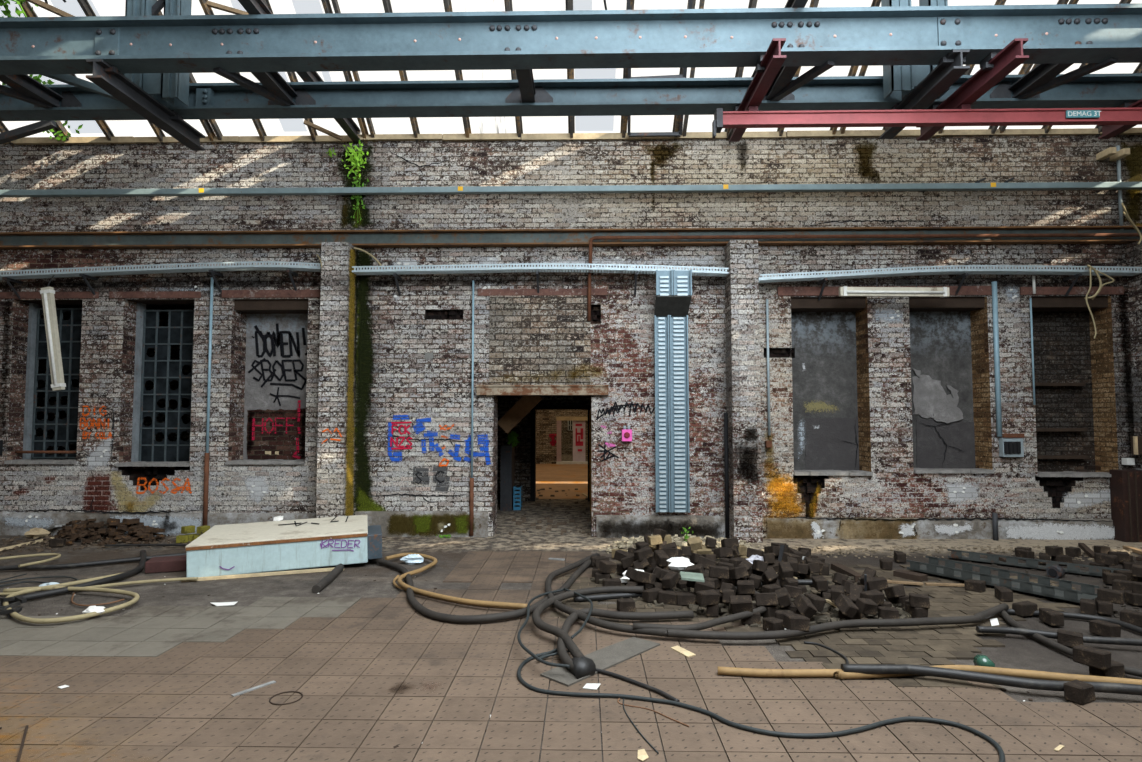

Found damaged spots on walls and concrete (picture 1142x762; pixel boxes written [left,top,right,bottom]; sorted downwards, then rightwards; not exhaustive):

water stain [855,142,879,181]
peeling [911,368,963,423]
crack [922,423,964,464]
spalling [83,430,201,536]
spalling [1035,477,1111,508]
peeling [1003,522,1115,540]